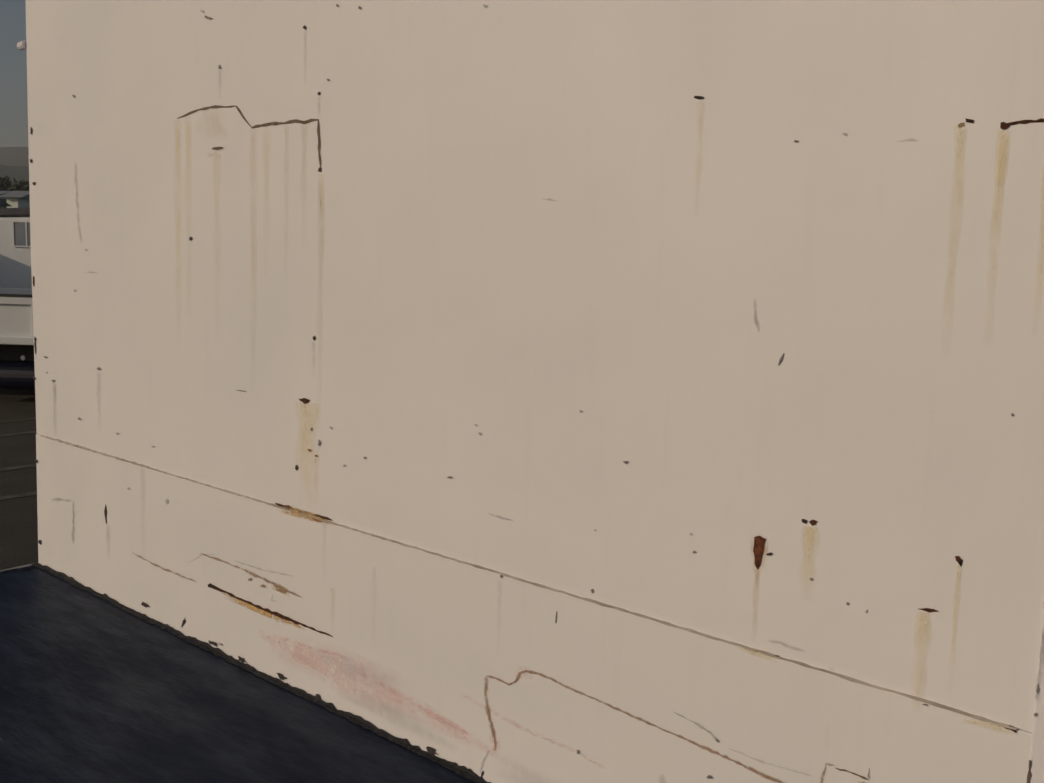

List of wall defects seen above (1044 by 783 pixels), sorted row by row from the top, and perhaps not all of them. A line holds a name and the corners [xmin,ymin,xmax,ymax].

crack [177,105,321,172]
corrosion [1000,118,1044,129]
corrosion [275,503,332,522]
corrosion [753,536,766,570]
peeling [31,562,491,783]
crack [485,670,783,783]